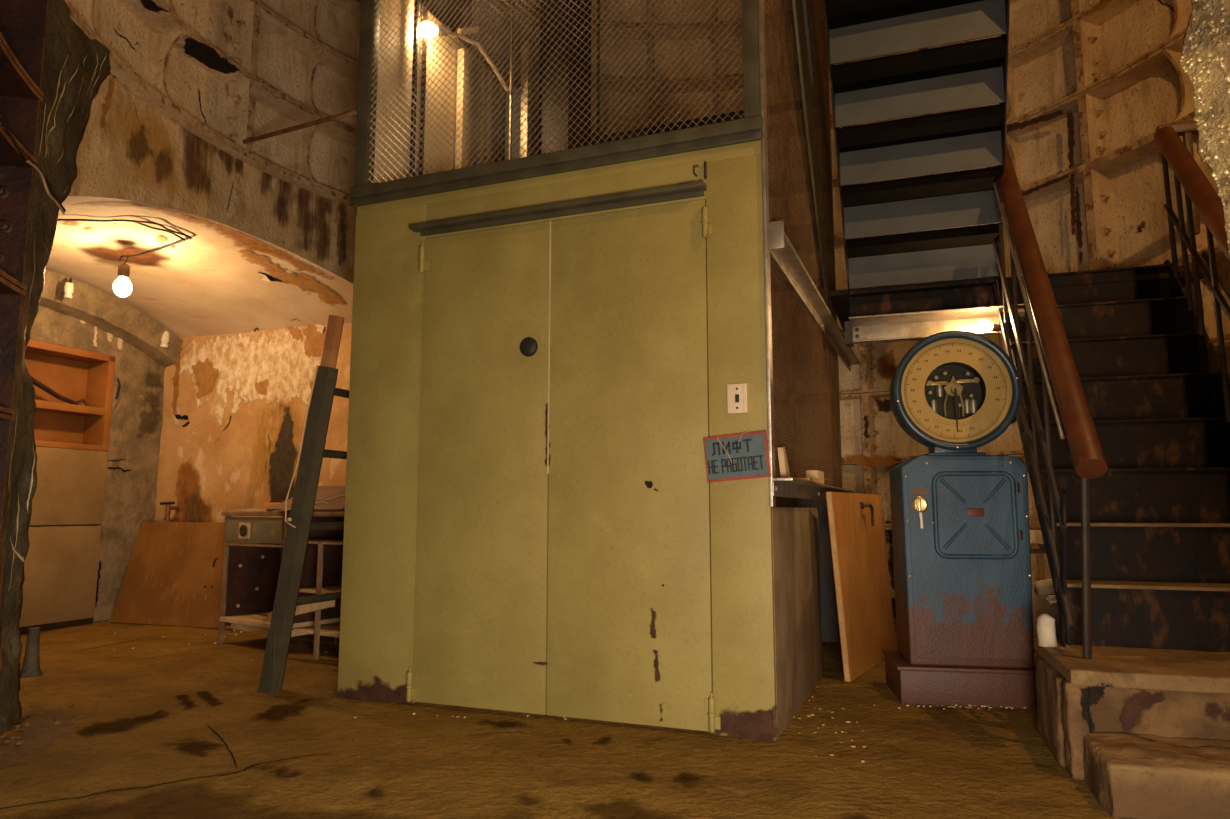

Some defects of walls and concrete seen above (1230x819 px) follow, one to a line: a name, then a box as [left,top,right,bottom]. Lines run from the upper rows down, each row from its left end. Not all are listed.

spalling [140,0,167,13]
spalling [184,38,239,74]
damp [101,78,243,193]
damp [83,244,168,266]
peeling [233,244,344,306]
peeling [175,324,326,427]
damp [250,407,299,503]
rust [650,608,660,681]
rust [334,677,412,706]
rust [714,706,779,742]
crack [0,725,337,809]